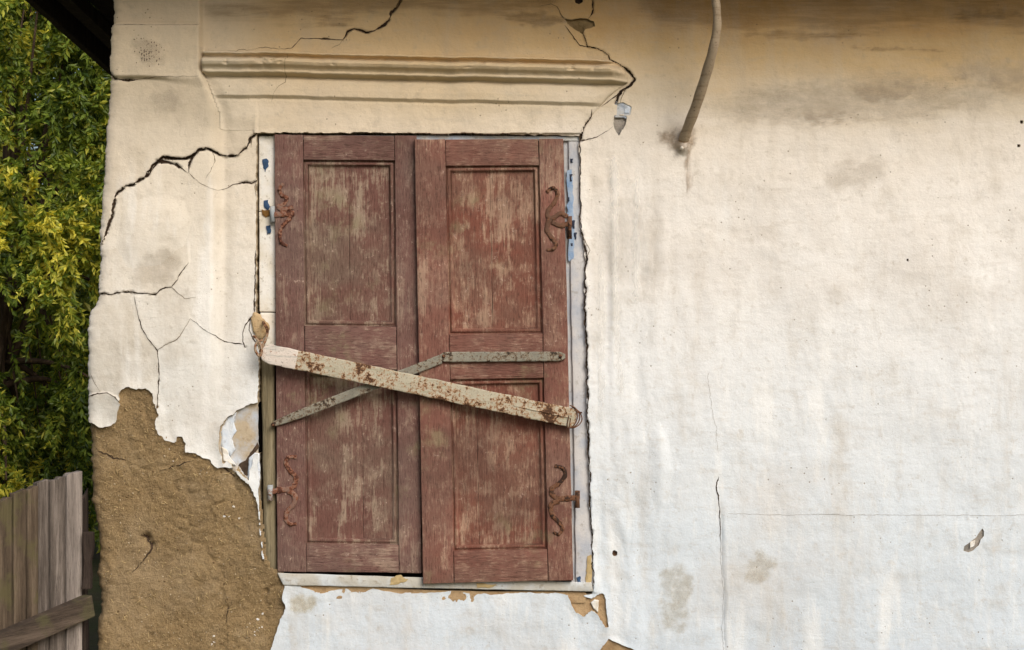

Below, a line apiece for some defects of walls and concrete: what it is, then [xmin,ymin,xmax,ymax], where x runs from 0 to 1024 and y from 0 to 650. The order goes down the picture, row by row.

crack [237,0,402,99]
crack [102,133,259,243]
crack [99,250,259,407]
spalling [90,387,285,650]
spalling [964,529,983,552]
spalling [564,591,633,650]